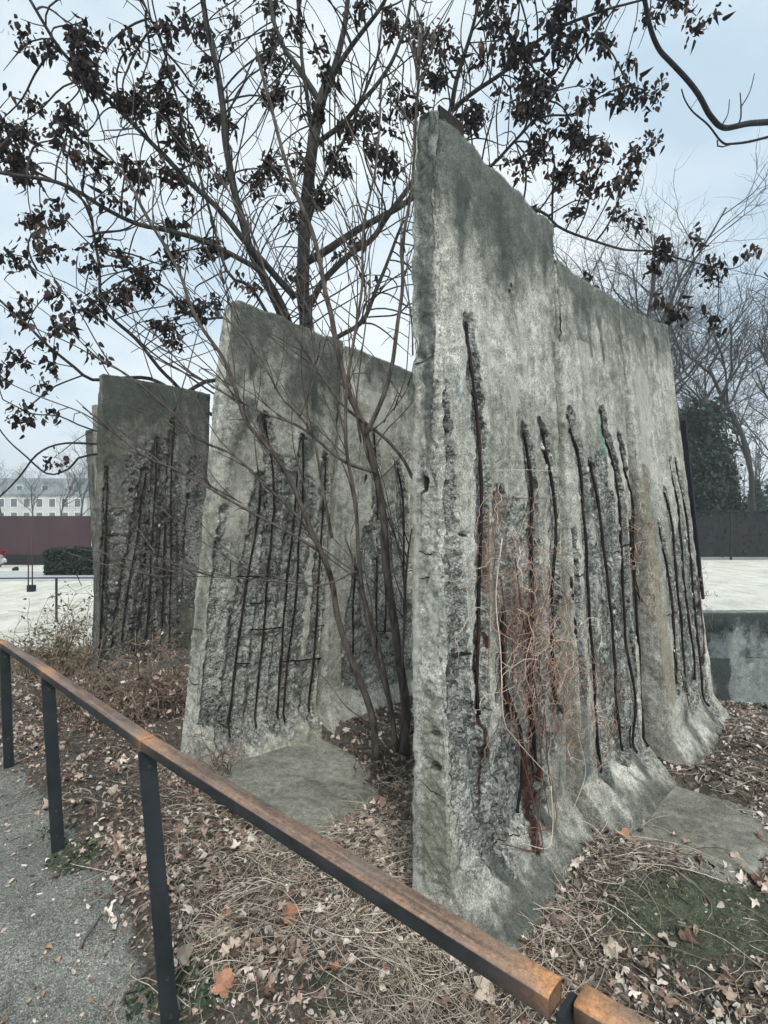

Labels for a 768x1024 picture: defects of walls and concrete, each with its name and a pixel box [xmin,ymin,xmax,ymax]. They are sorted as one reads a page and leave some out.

spalling [97,410,330,761]
corrosion [475,696,490,808]
corrosion [472,599,512,721]
spalling [340,310,658,886]
spalling [657,456,721,718]
corrosion [696,575,706,666]